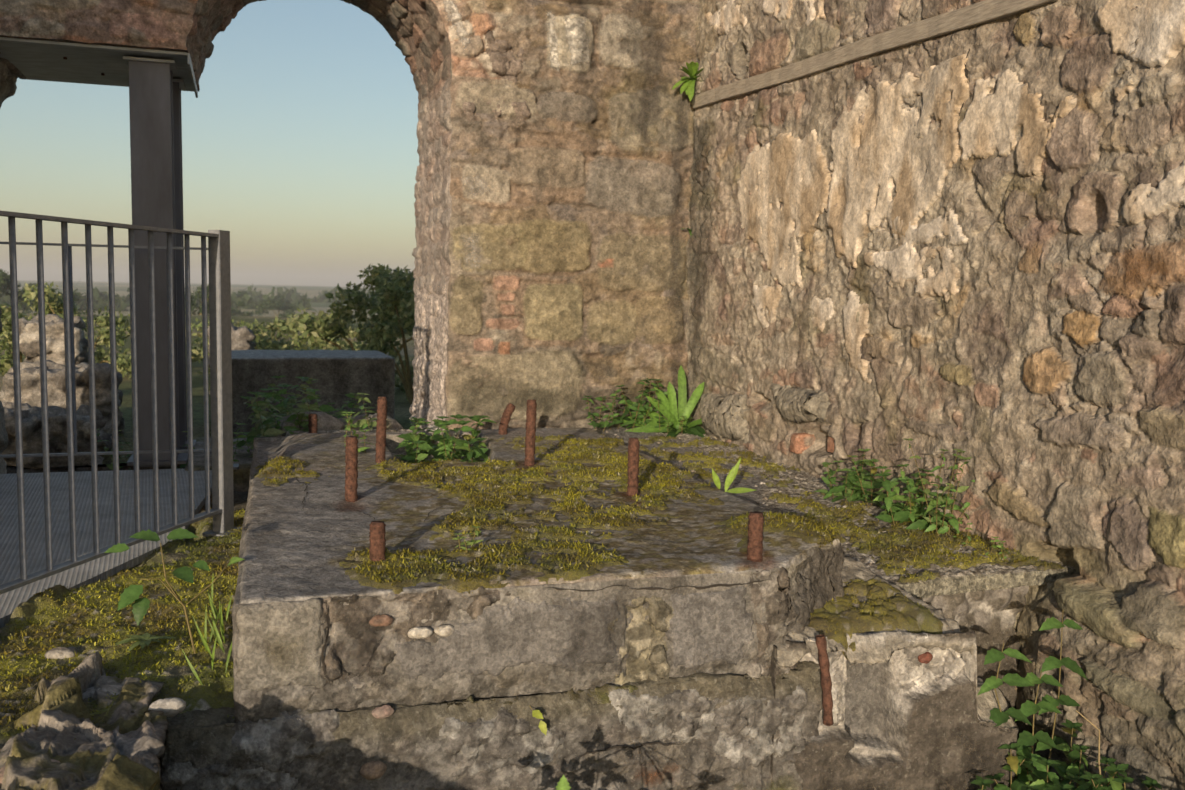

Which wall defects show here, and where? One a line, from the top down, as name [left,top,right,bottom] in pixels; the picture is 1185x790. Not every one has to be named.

peeling [1096,0,1185,69]
peeling [1112,85,1134,102]
peeling [737,53,1077,329]
peeling [1123,160,1185,225]
peeling [810,291,872,384]
crack [1105,497,1120,574]